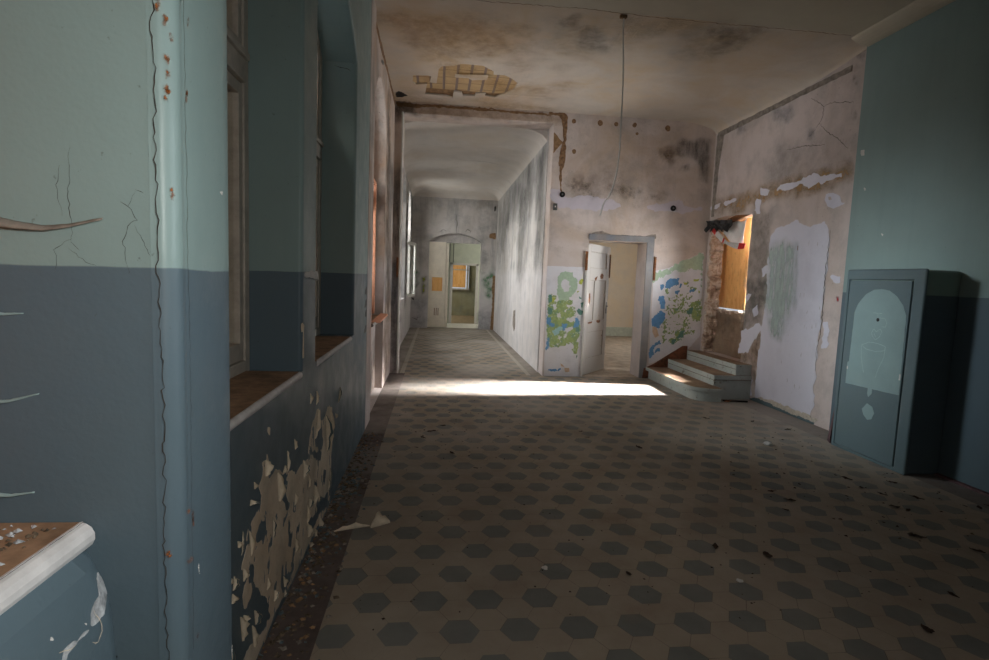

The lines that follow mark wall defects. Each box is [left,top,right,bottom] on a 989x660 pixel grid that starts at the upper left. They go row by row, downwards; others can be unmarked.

spalling [413,64,517,93]
peeling [0,217,102,231]
peeling [750,220,830,425]
peeling [231,387,342,660]